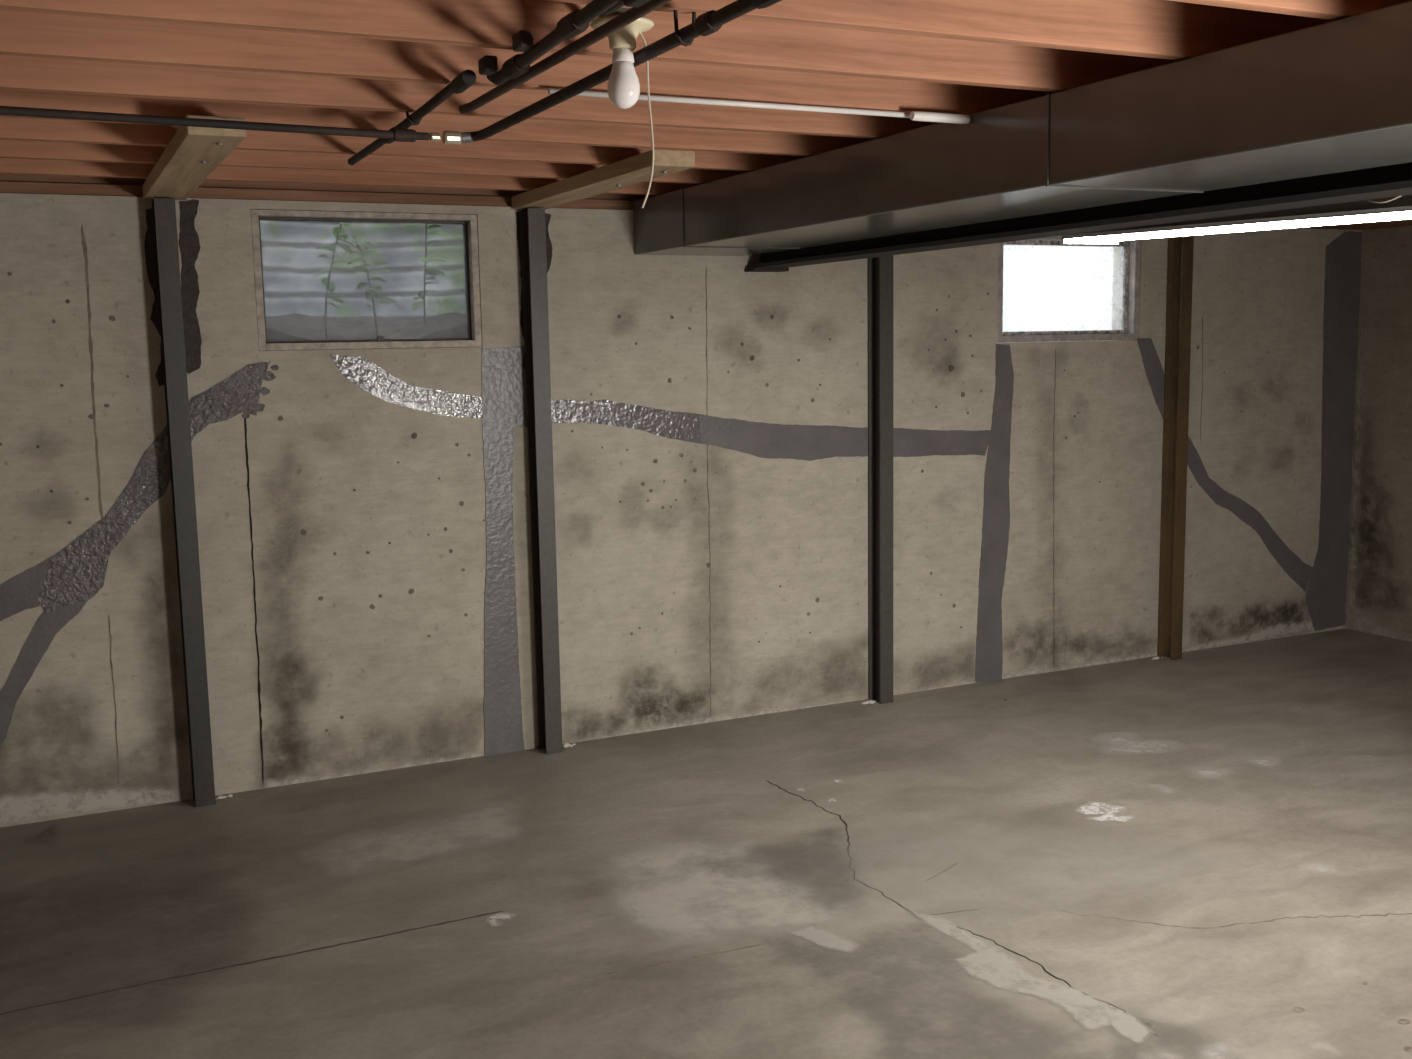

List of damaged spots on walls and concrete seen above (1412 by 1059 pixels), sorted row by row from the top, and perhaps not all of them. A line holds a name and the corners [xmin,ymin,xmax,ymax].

crack [0,361,279,783]
leakage [266,753,484,788]
crack [329,344,1014,756]
leakage [579,699,862,738]
leakage [1060,652,1157,670]
leakage [1184,606,1312,652]
crack [1137,231,1363,631]
leakage [1345,328,1412,642]
crack [766,780,1158,1036]
crack [1062,909,1412,929]